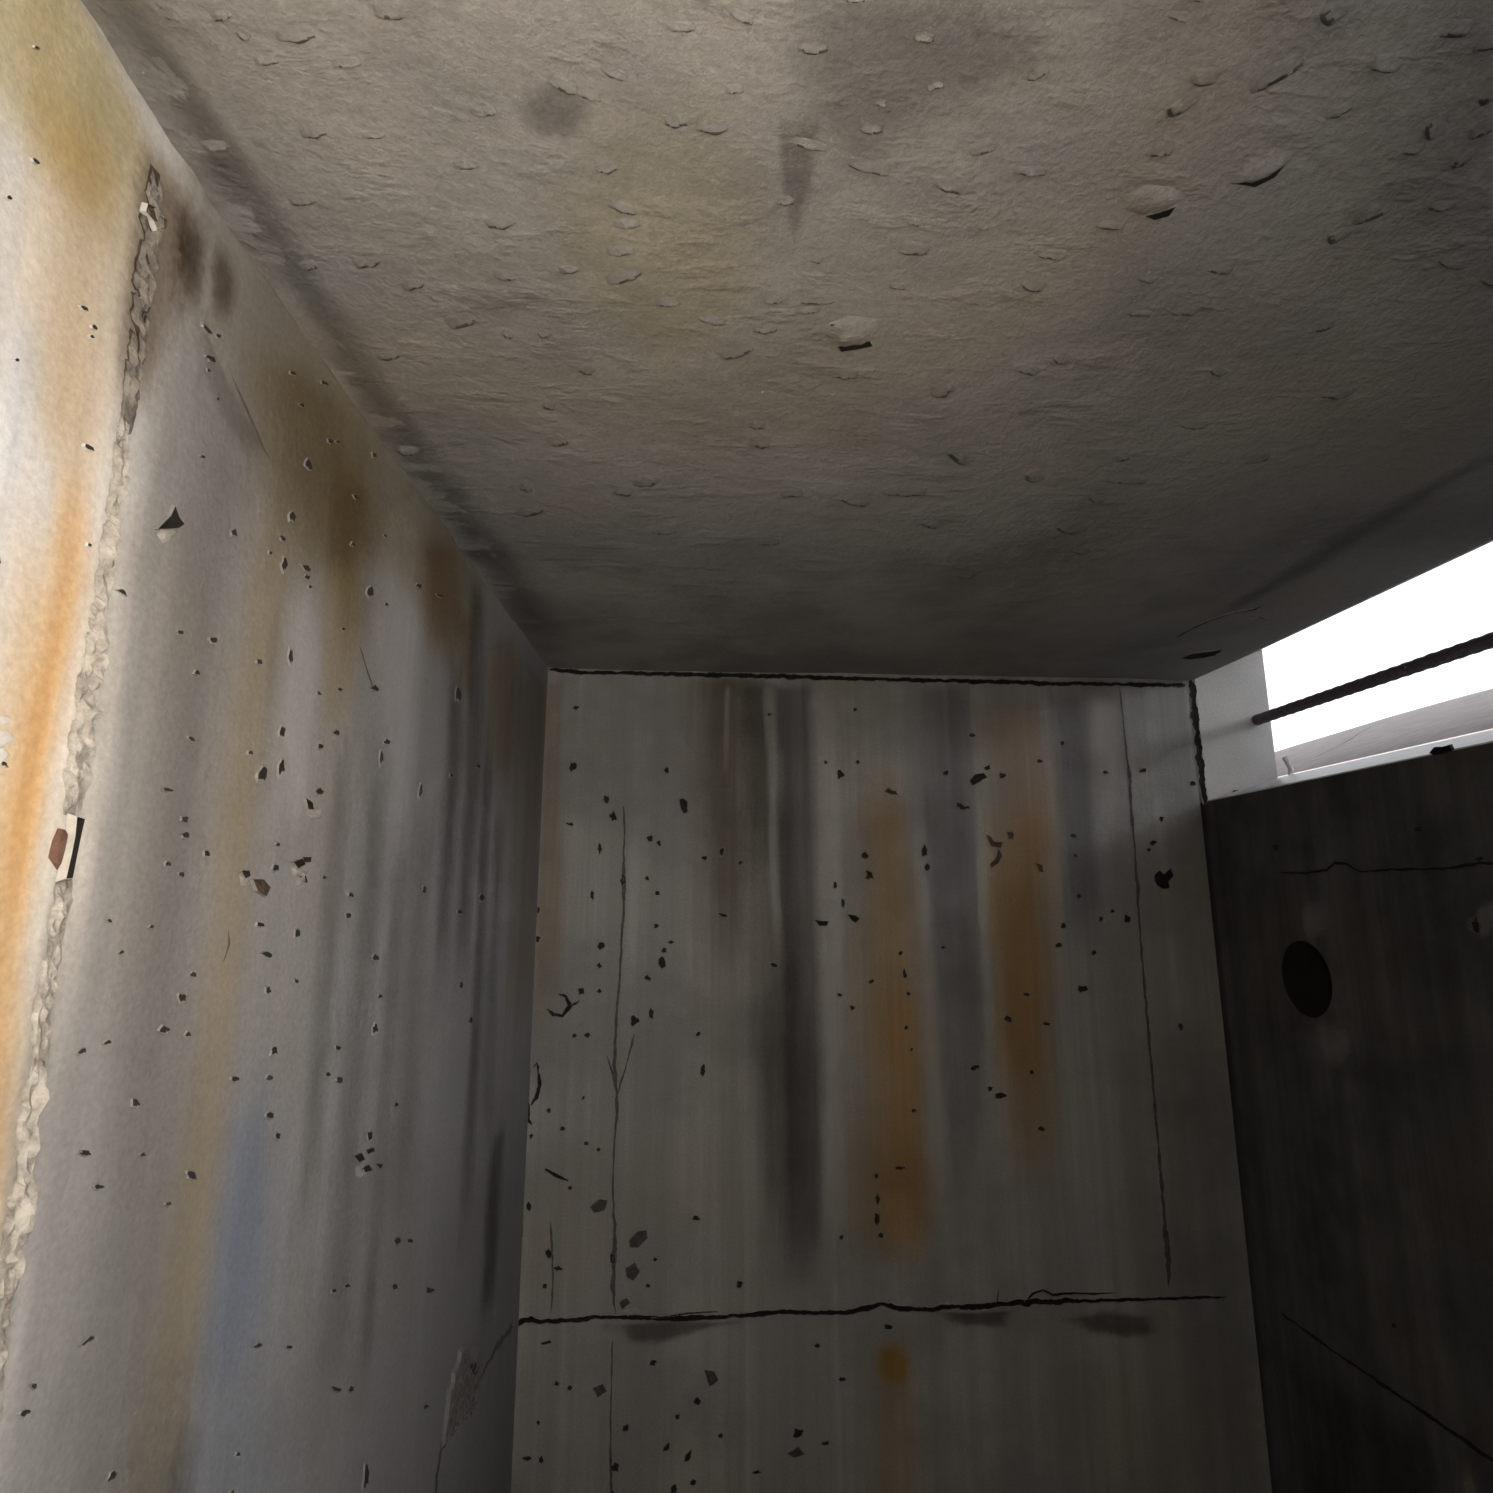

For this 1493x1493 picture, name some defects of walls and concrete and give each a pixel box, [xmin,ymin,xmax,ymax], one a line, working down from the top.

spalling [139,202,168,231]
crack [360,648,374,692]
spalling [48,813,85,882]
crack [1279,860,1493,875]
crack [482,668,1269,1493]
crack [1281,1312,1493,1463]
crack [435,1411,472,1493]